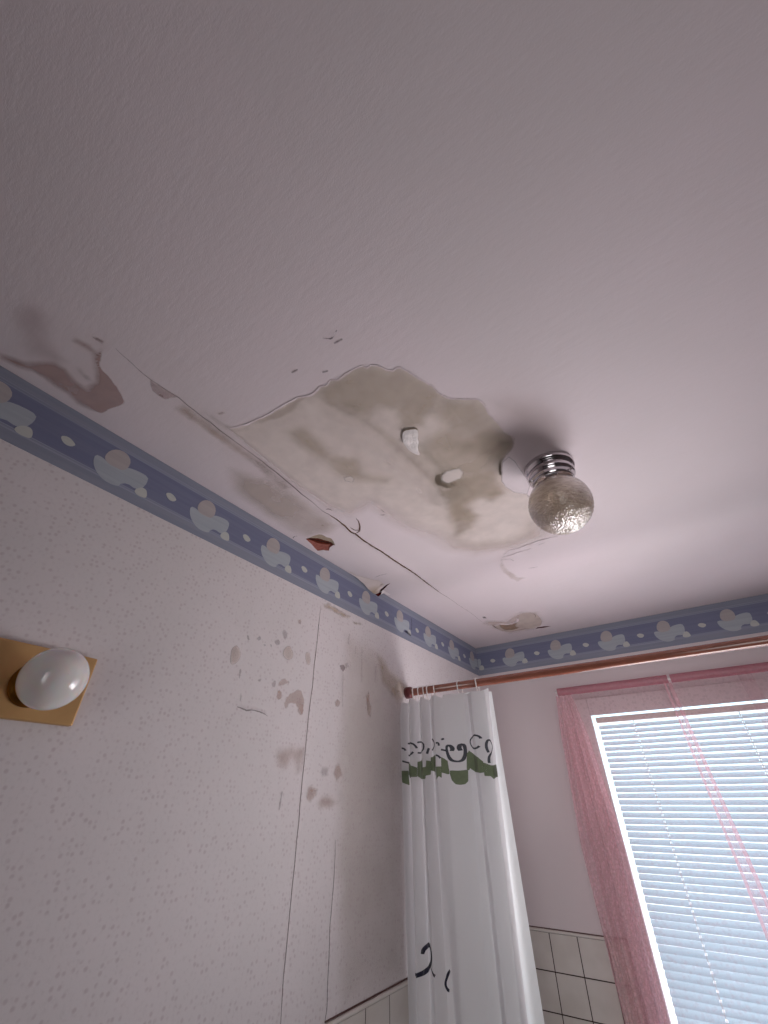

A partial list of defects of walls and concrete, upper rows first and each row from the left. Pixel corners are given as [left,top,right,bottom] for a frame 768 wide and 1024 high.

crack [117,350,482,622]
spalling [304,534,335,552]
peeling [219,365,537,548]
peeling [483,613,549,632]